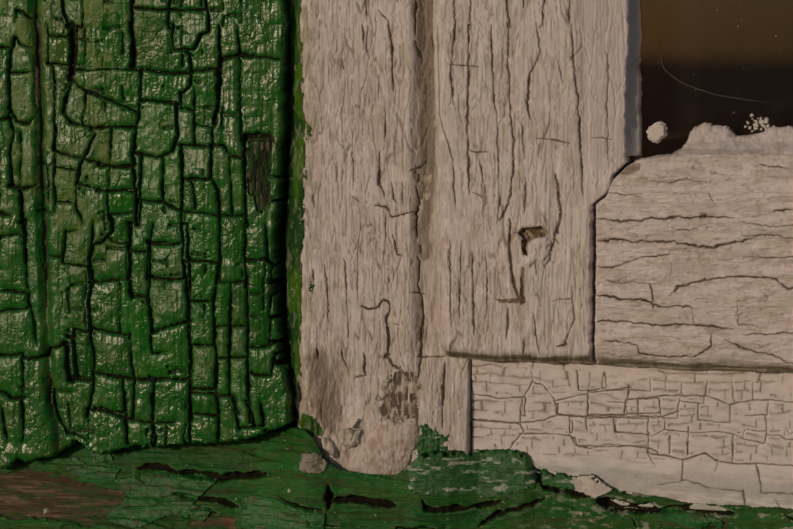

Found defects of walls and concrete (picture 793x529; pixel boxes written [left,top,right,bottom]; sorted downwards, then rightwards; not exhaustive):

peeling [245,132,275,213]
crack [0,0,291,443]
crack [312,0,446,429]
crack [397,0,793,507]
peeling [376,367,422,422]
peeling [0,451,326,529]
peeling [298,418,362,474]
peeling [572,474,613,499]